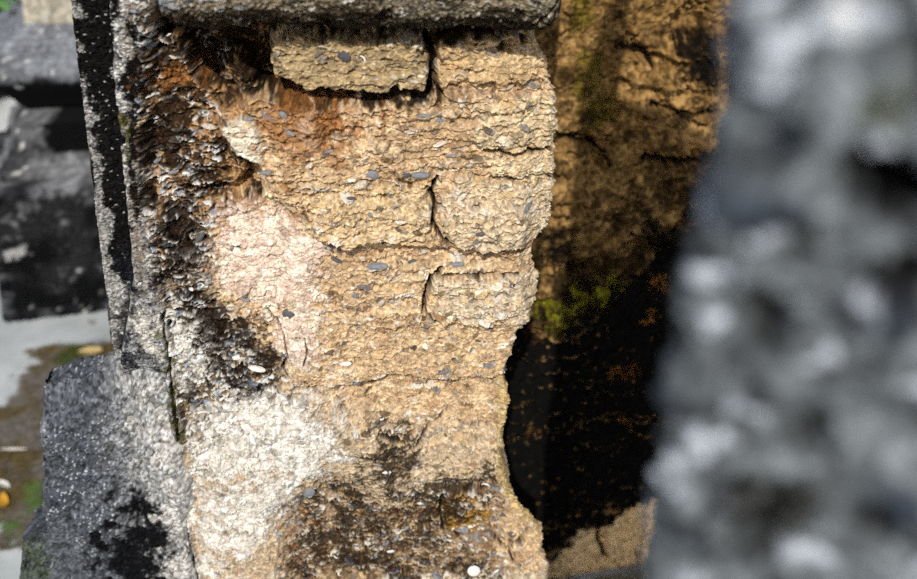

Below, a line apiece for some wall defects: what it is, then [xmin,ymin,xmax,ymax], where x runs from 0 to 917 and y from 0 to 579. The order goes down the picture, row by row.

crack [422,28,443,102]
crack [428,174,448,240]
damp [0,0,561,579]
crack [422,250,519,321]